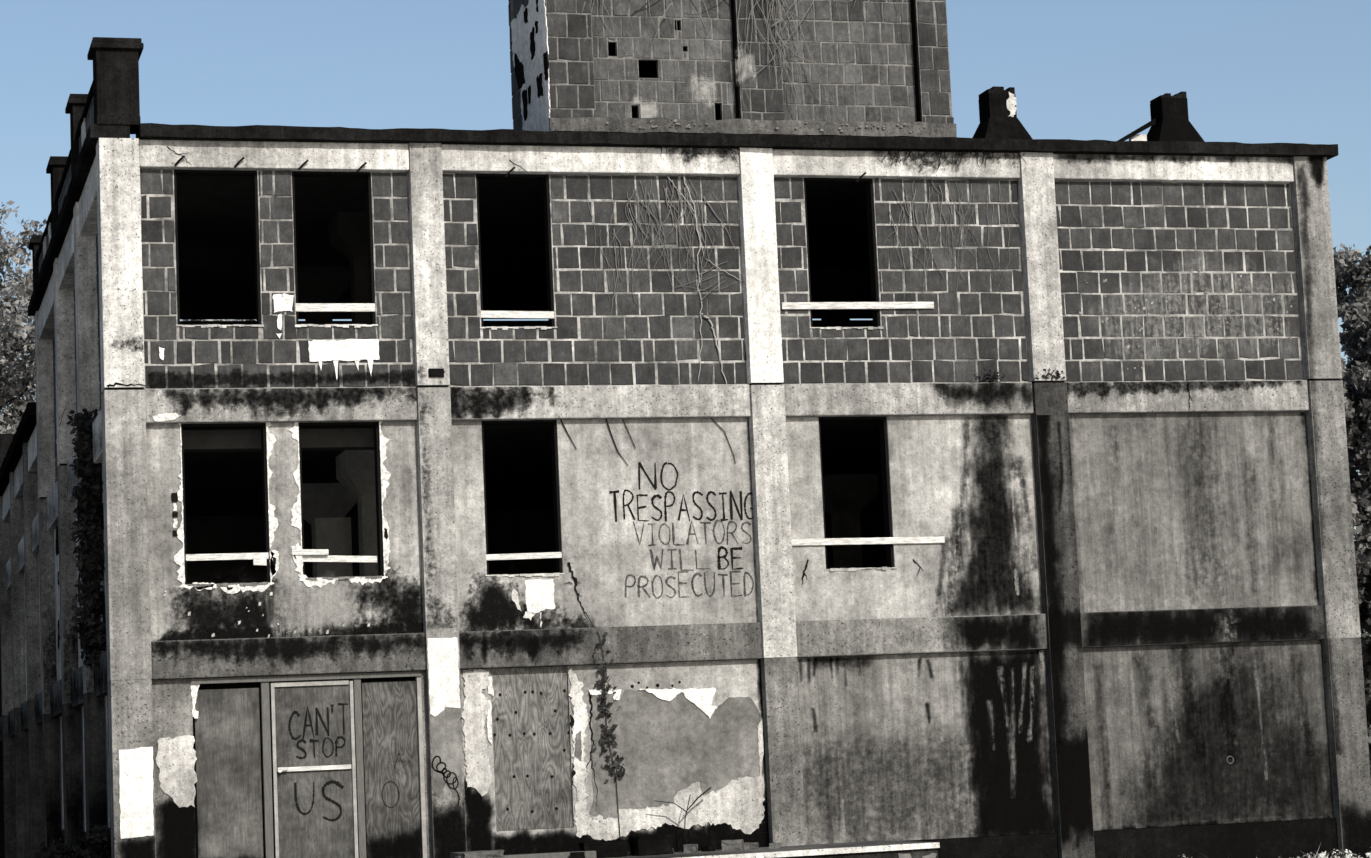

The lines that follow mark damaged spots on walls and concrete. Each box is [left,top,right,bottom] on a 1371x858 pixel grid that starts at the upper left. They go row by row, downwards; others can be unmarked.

peeling [511,0,551,131]
water stain [148,367,427,425]
spalling [152,413,391,638]
water stain [151,531,595,665]
peeling [511,587,543,627]
crack [567,562,585,614]
water stain [800,383,1371,858]
peeling [568,668,765,841]